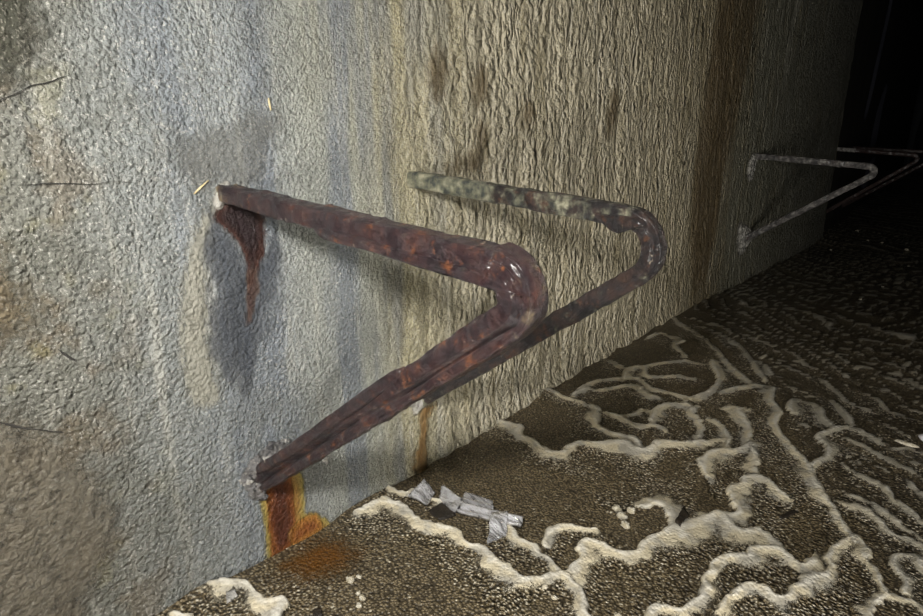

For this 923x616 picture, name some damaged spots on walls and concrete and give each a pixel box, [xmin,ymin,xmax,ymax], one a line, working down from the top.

rust [215,204,265,322]
rust [314,228,522,296]
rust [596,214,647,233]
rust [256,367,404,474]
rust [412,405,434,475]
rust [260,472,330,559]